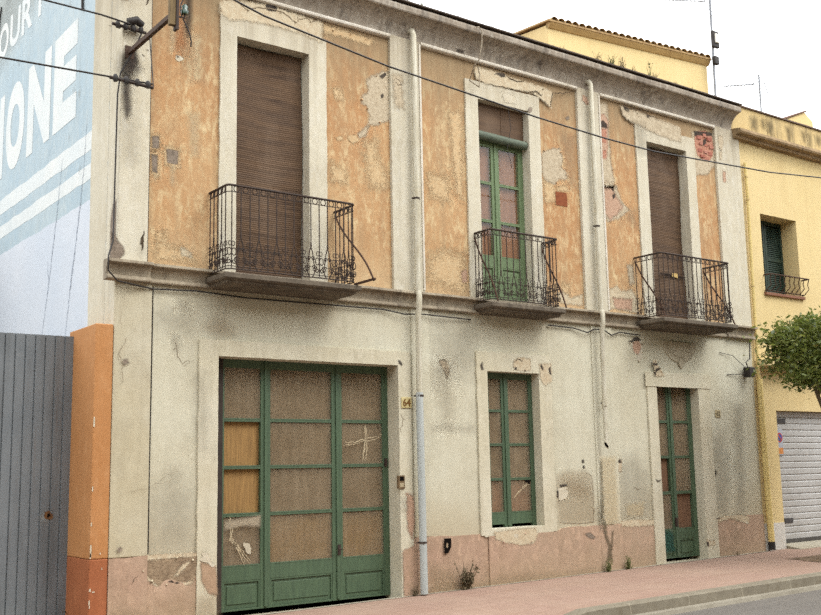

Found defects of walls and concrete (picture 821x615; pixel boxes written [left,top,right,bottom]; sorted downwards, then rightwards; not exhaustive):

flaking render [474,67,572,108]
peeling [336,71,390,191]
flaking render [621,105,681,142]
peeling [542,148,569,207]
flaking render [600,103,629,222]
flaking render [628,337,643,362]
spalling [513,357,552,386]
flaking render [557,484,568,501]
peeling [494,527,538,545]
flaking render [143,552,218,595]